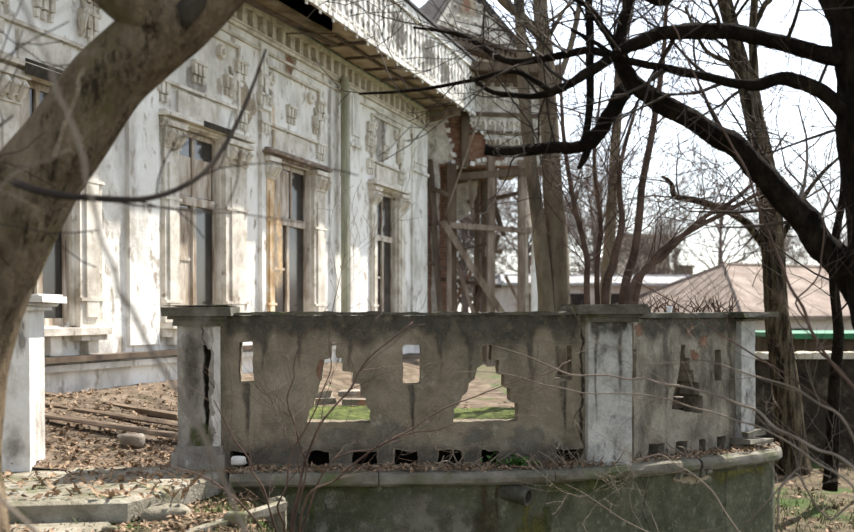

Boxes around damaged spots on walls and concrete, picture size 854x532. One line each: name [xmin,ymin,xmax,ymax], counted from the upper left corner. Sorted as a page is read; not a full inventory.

flaking render [443,116,510,169]
crack [201,326,214,431]